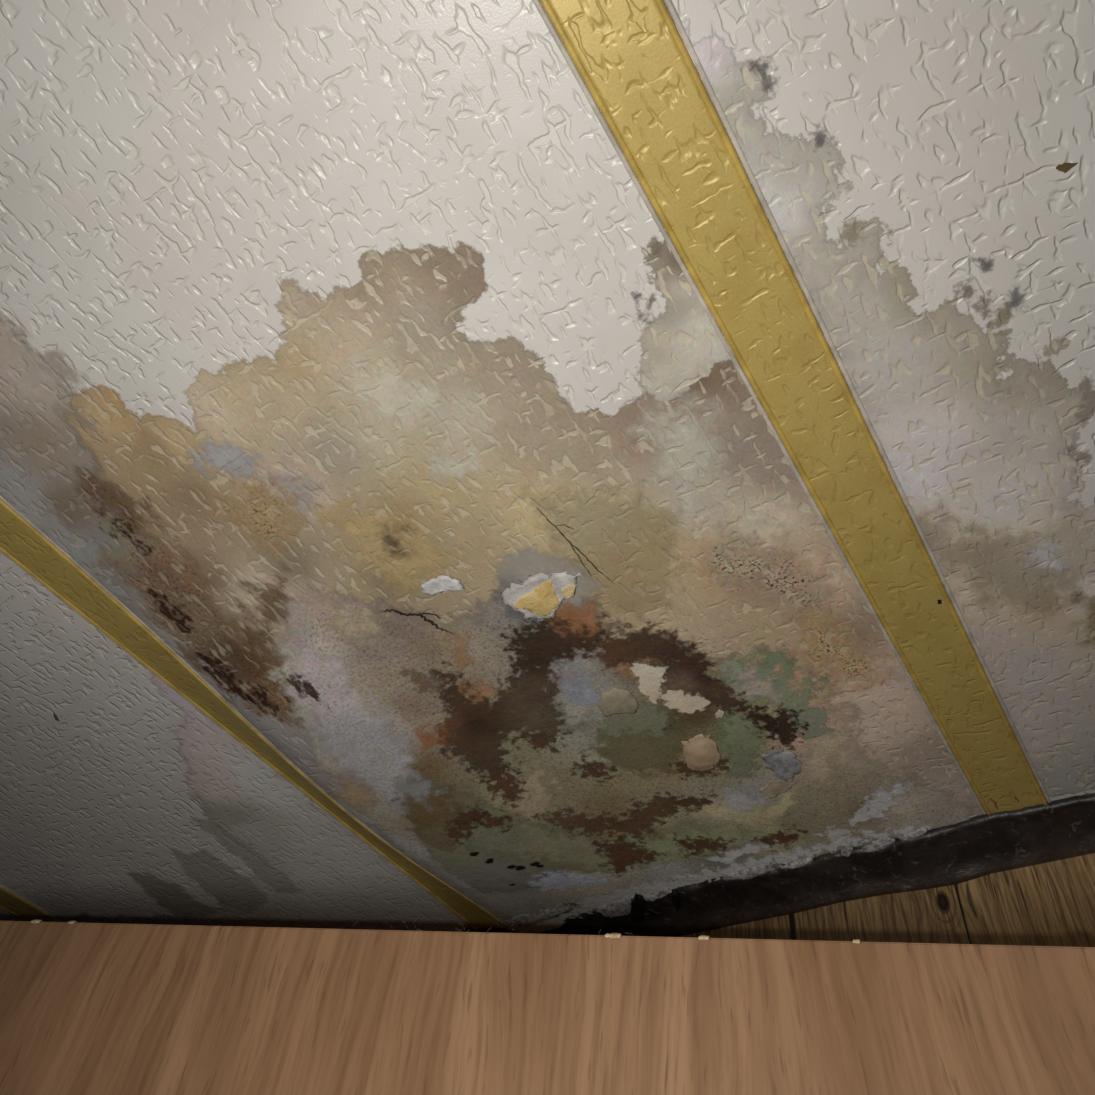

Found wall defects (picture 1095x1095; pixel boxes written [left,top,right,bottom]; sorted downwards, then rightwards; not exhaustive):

leakage [675,19,1095,797]
leakage [0,913,24,921]
leakage [57,673,470,932]
crack [379,609,455,635]
leakage [0,228,983,865]
leakage [507,790,714,892]
flaking render [269,571,973,930]